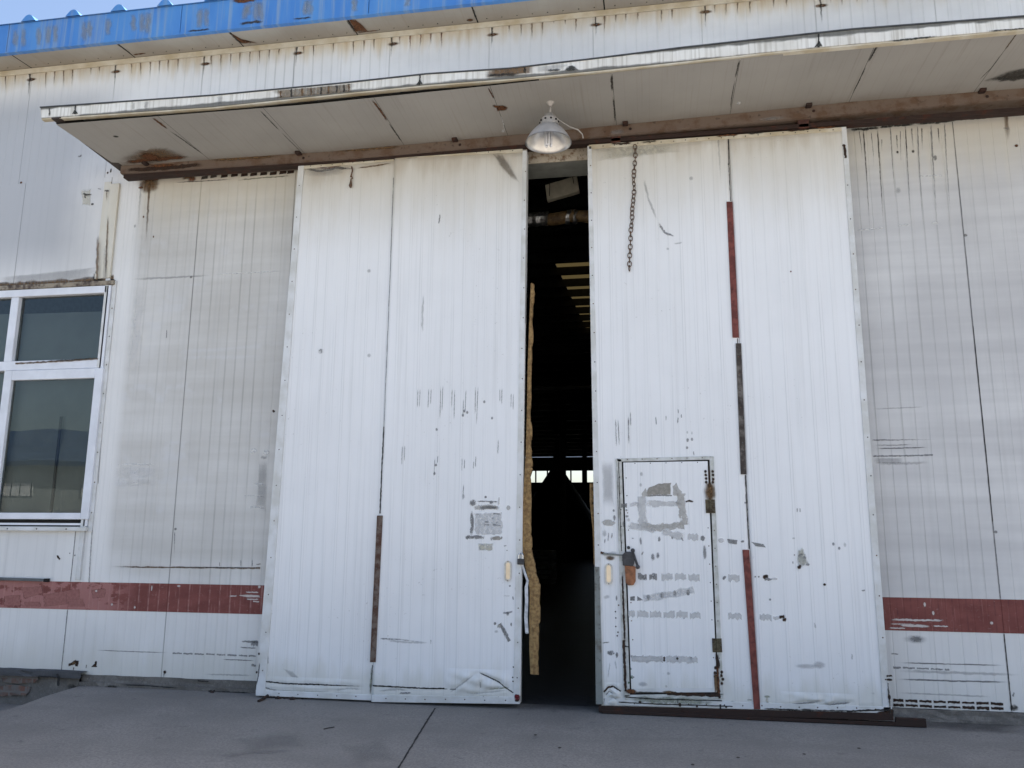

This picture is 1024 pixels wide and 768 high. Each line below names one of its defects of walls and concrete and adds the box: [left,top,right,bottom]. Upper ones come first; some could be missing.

rust [347,20,378,49]
rust [128,149,200,221]
peeling [466,496,510,540]
peeling [621,483,705,541]
peeling [630,573,701,618]